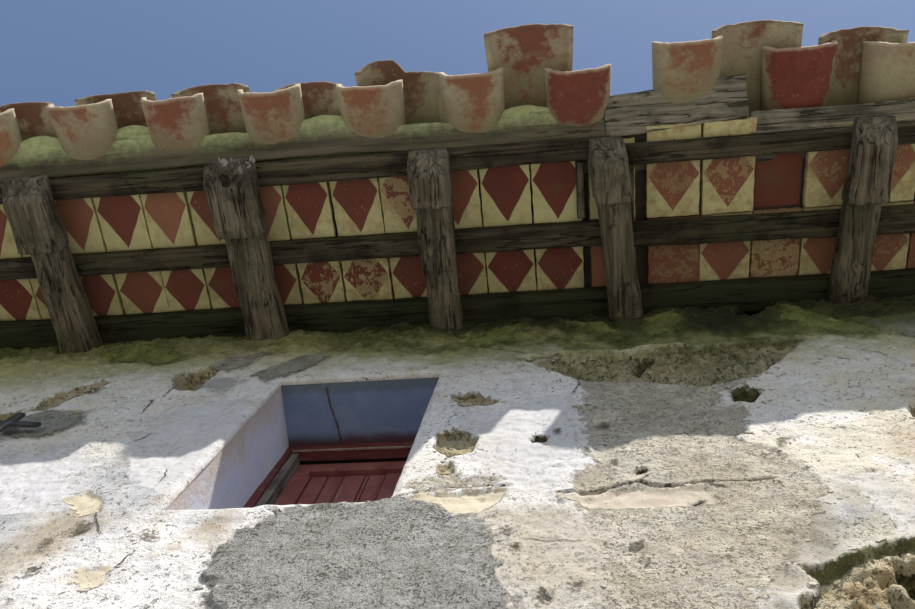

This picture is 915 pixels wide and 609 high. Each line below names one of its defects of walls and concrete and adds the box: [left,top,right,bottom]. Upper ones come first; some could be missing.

flaking render [0,378,110,420]
flaking render [168,365,220,391]
crack [326,387,342,445]
flaking render [449,391,506,407]
flaking render [404,426,507,515]
crack [583,474,734,496]
flaking render [519,335,915,609]